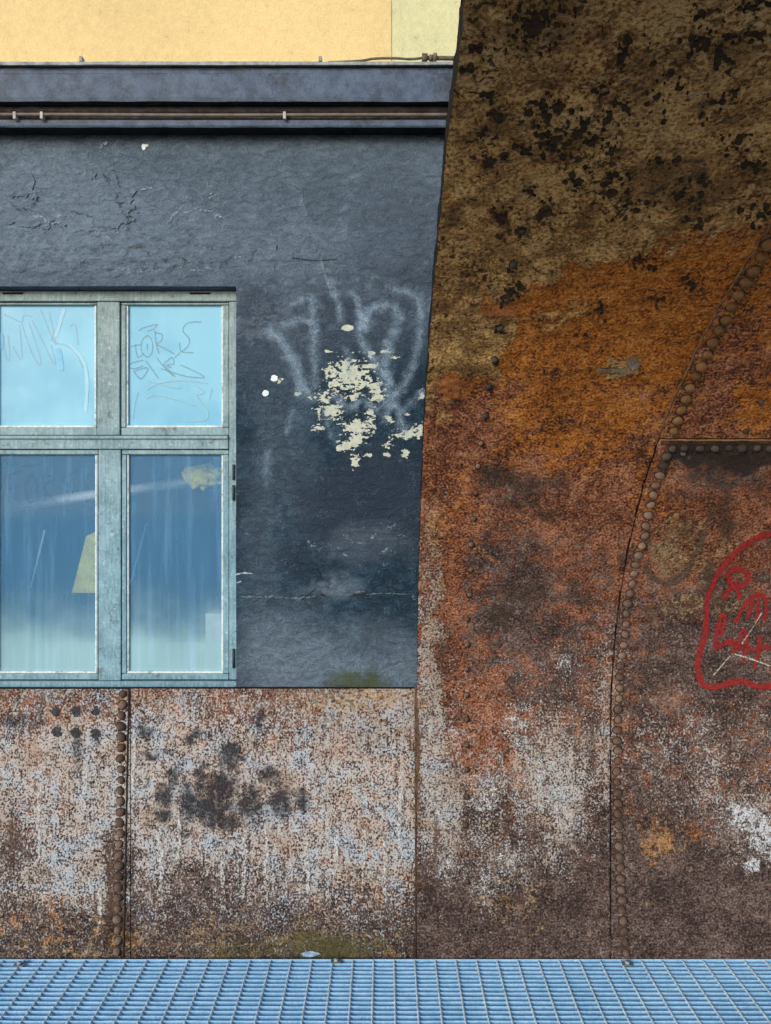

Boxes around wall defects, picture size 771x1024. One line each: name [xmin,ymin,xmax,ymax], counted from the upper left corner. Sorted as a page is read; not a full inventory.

crack [16,174,222,248]
rust [474,302,524,320]
peeling [294,348,423,471]
leakage [154,743,241,858]
rust [638,822,705,863]